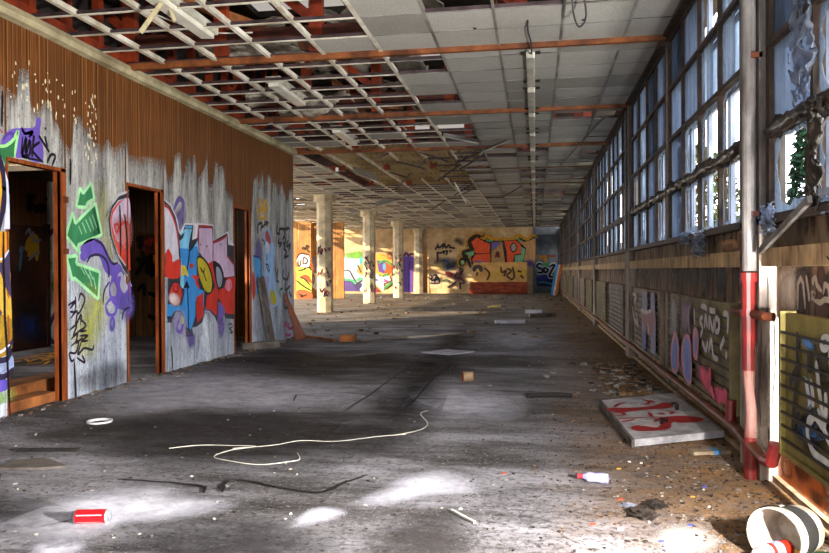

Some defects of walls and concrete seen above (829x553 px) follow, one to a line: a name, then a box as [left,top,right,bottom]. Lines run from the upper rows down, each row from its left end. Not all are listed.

peeling [0,61,234,399]
peeling [251,175,294,342]
crack [293,354,447,415]